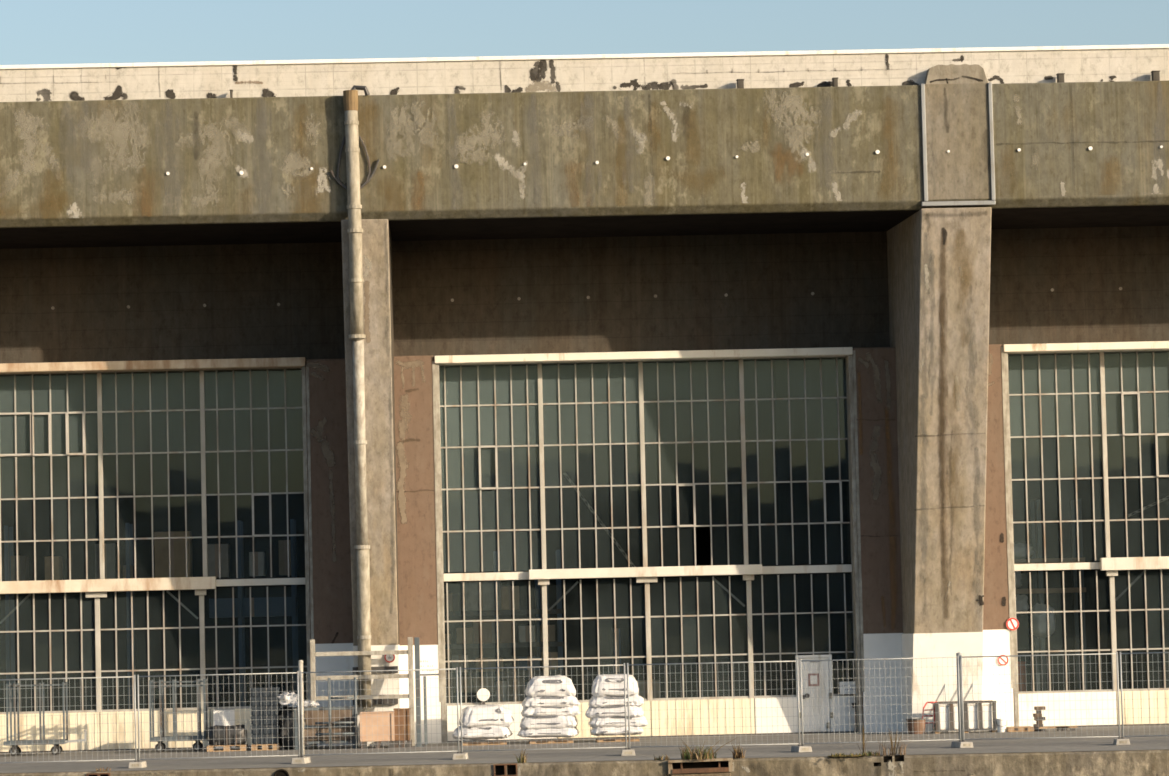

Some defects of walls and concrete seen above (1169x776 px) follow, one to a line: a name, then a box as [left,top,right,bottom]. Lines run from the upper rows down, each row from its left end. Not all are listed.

spalling [505,60,561,93]
spalling [613,79,708,142]
peeling [768,80,852,172]
peeling [281,139,368,198]
peeling [1151,159,1169,194]